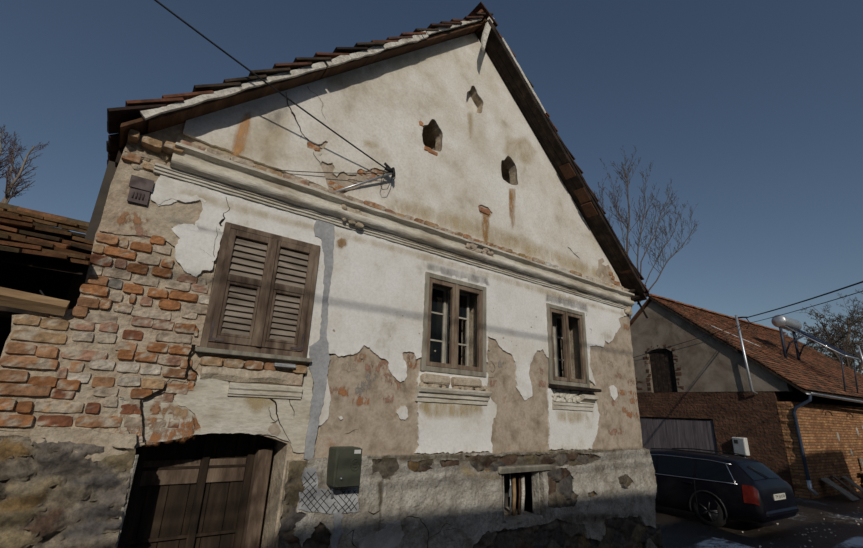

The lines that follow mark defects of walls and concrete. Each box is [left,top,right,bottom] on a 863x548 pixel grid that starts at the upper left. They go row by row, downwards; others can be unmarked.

damp [234,115,250,156]
crack [286,94,321,164]
flaking render [307,142,390,194]
flaking render [0,156,246,446]
crack [119,344,198,443]
crack [269,372,294,443]
flaking render [278,309,684,548]